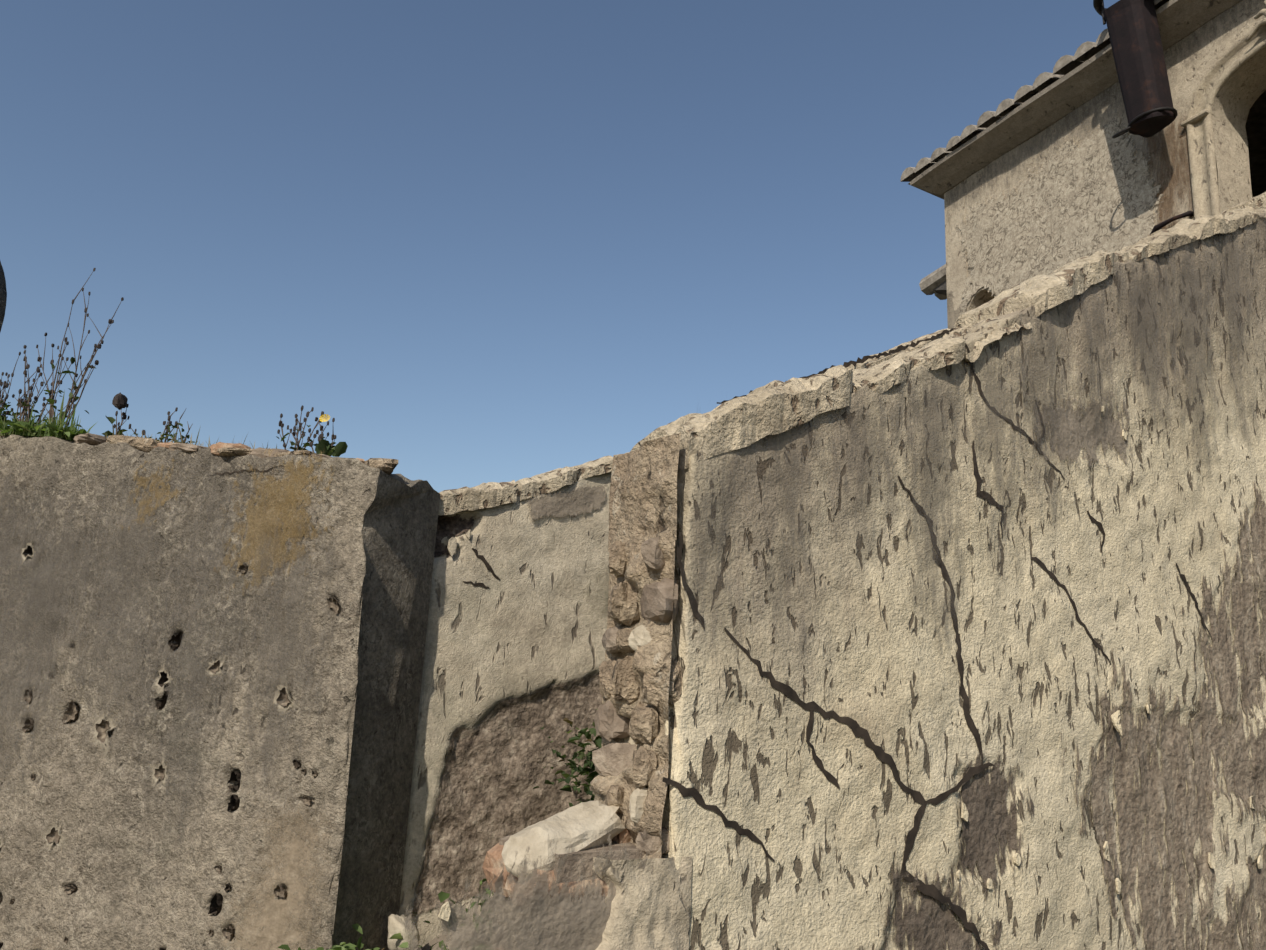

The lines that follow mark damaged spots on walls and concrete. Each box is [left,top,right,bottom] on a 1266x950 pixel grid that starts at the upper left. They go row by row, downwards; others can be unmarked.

crack [785,327,1065,479]
crack [972,441,1004,538]
crack [1031,557,1112,665]
peeling [1026,381,1131,472]
crack [1087,511,1105,554]
crack [1176,563,1212,640]
crack [662,476,995,950]
peeling [1061,481,1266,950]
spalling [405,674,653,950]
peeling [883,754,1034,950]